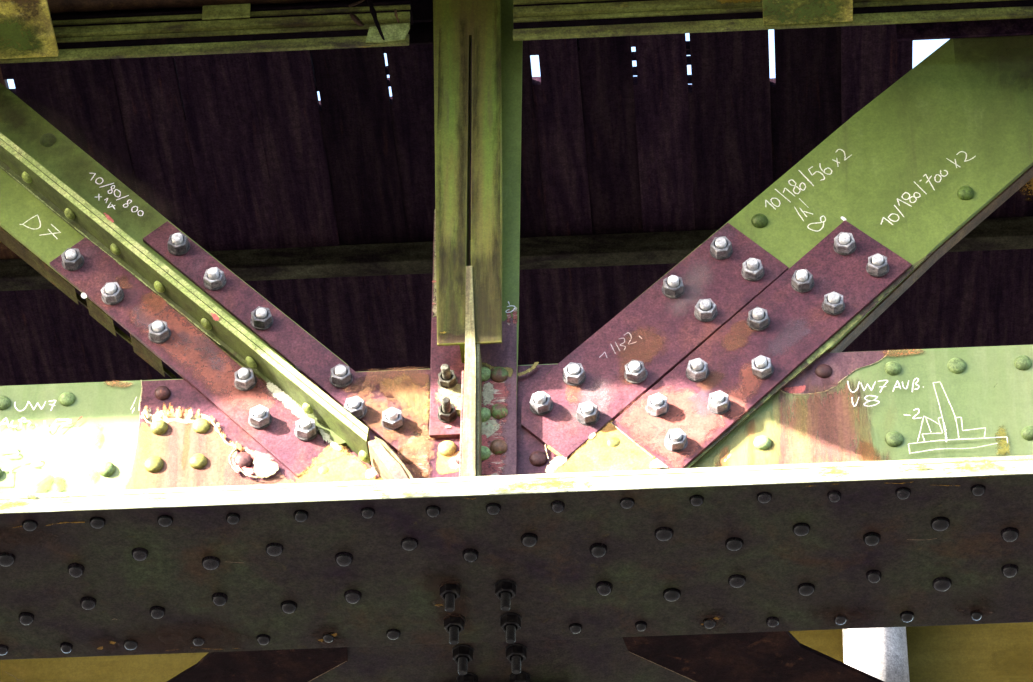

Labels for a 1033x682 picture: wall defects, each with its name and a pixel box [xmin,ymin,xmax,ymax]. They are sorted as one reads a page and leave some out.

peeling [138,380,279,478]
corrosion [345,367,433,479]
peeling [481,362,539,476]
corrosion [760,348,924,465]